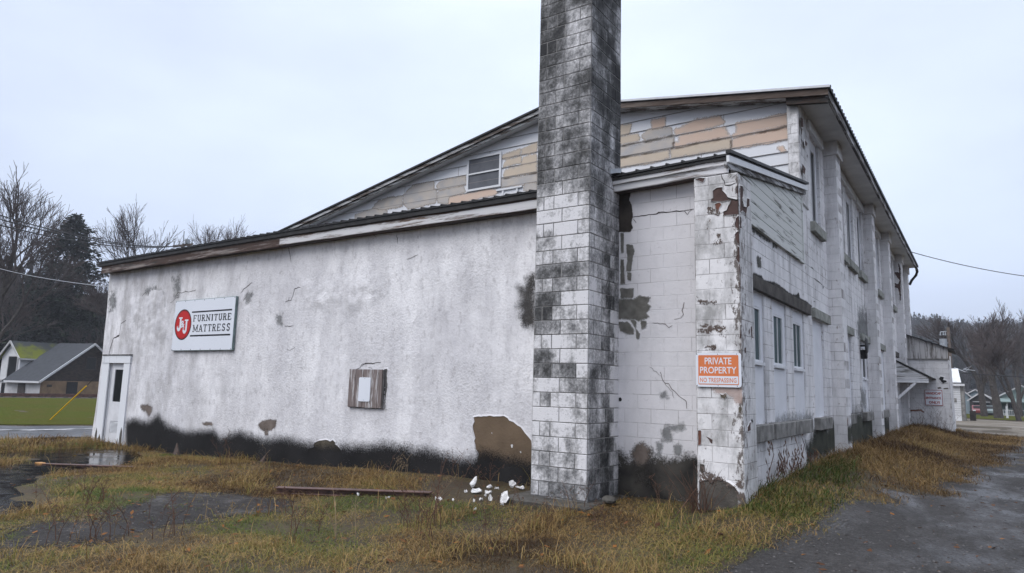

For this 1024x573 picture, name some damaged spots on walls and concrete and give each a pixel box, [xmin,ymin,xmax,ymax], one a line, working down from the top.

crack [634,209,692,222]
spalling [695,177,750,287]
peeling [618,193,651,339]
mould [517,274,535,327]
crack [650,367,687,409]
damp [125,415,531,486]
spalling [471,414,532,472]
damp [618,424,698,502]
spalling [697,464,741,510]